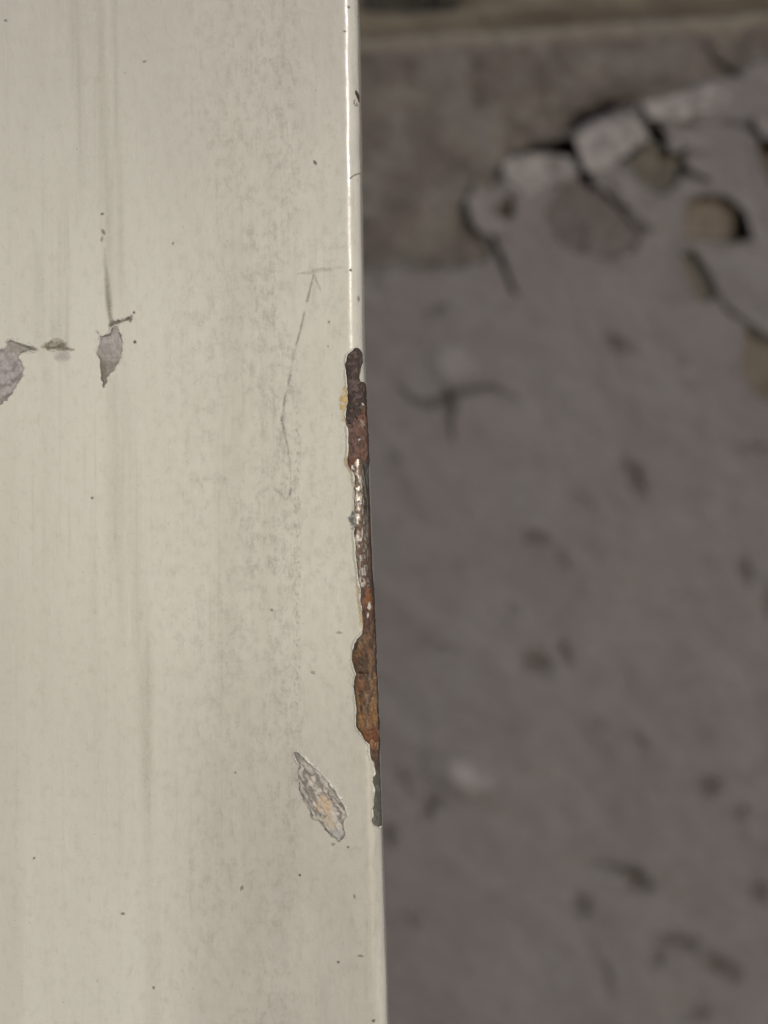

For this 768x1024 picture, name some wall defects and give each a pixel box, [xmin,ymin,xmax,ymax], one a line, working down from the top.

peeling [0,338,39,405]
peeling [97,313,132,388]
corrosion [340,348,382,829]
peeling [292,752,349,842]